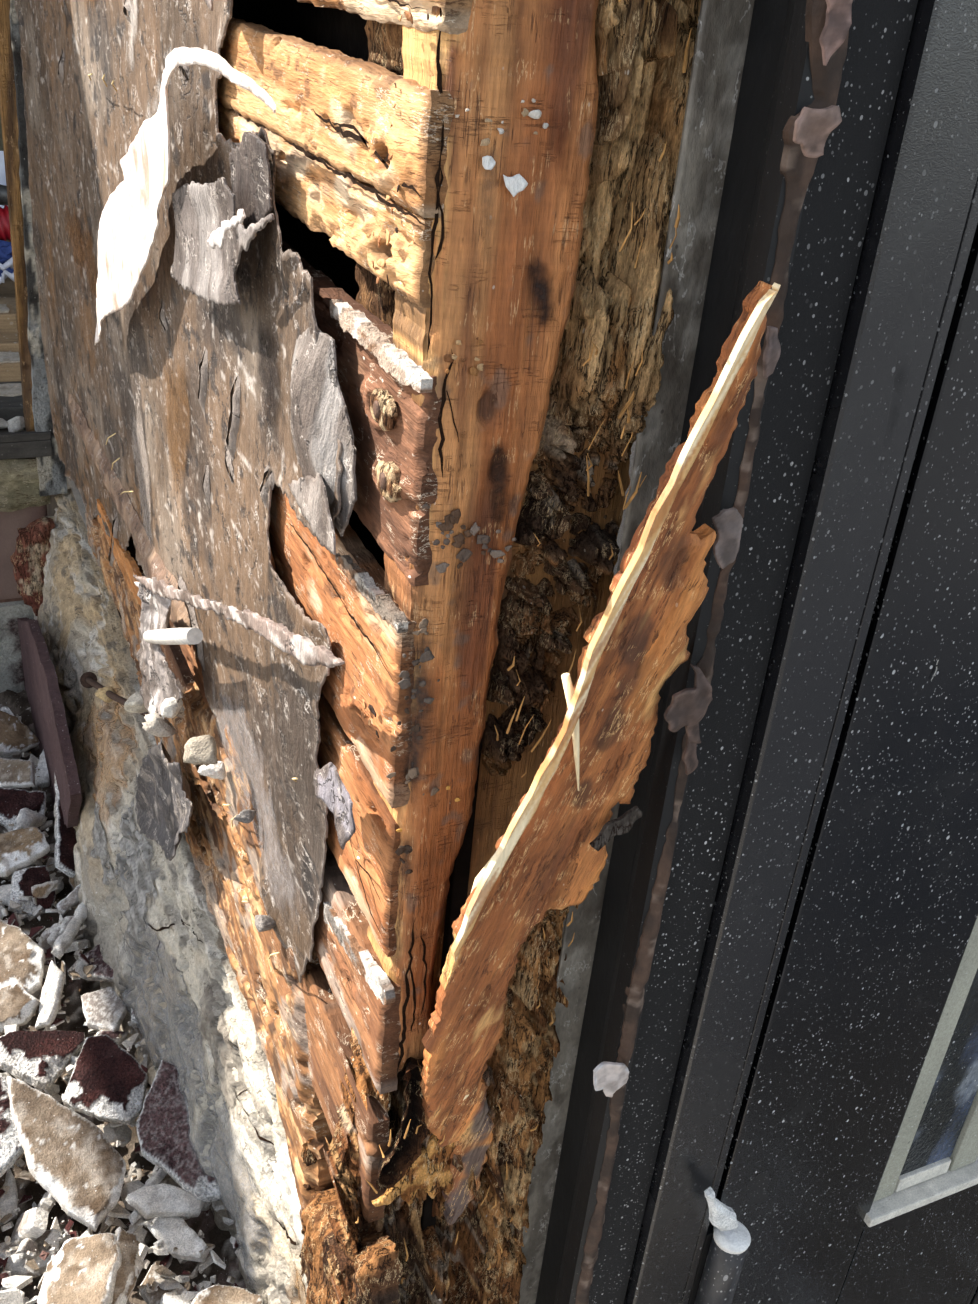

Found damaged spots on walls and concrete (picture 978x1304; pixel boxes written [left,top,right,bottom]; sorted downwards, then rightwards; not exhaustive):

peeling [521,98,549,135]
peeling [480,118,528,197]
crack [283,0,459,477]
peeling [443,337,484,376]
peeling [421,503,517,573]
peeling [397,618,440,741]
peeling [386,767,420,784]
peeling [395,829,413,874]
peeling [590,806,642,851]
spalling [197,984,247,1107]
spalling [376,1061,430,1190]